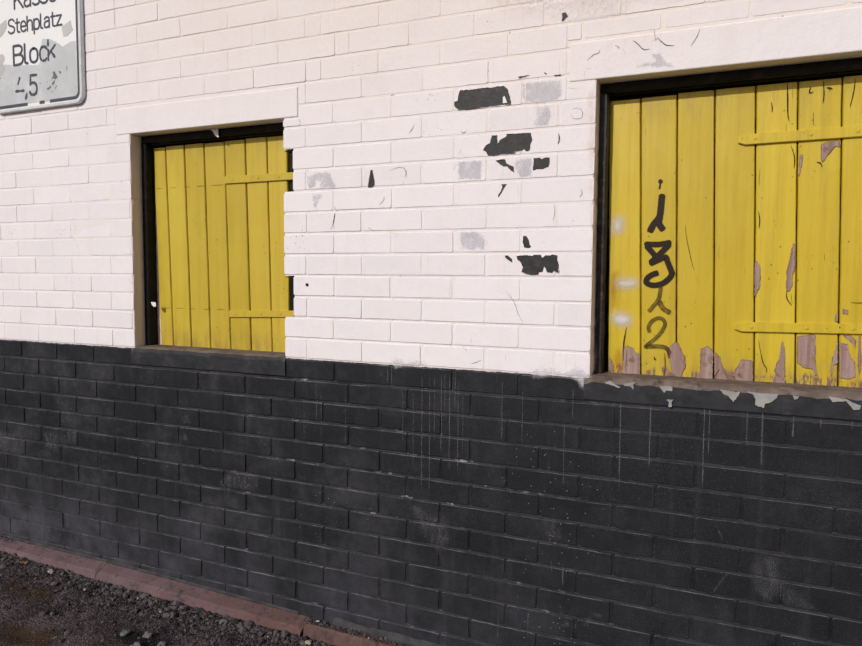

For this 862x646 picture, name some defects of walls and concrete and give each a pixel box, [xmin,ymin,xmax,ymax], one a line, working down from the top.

peeling [454,86,511,110]
peeling [459,133,550,178]
peeling [505,236,559,275]
peeling [786,244,795,292]
damp [534,370,588,385]
peeling [605,346,641,390]
peeling [660,342,686,407]
peeling [696,346,778,408]
peeling [774,342,785,383]
peeling [797,334,817,376]
peeling [830,335,862,379]
peeling [829,396,861,410]